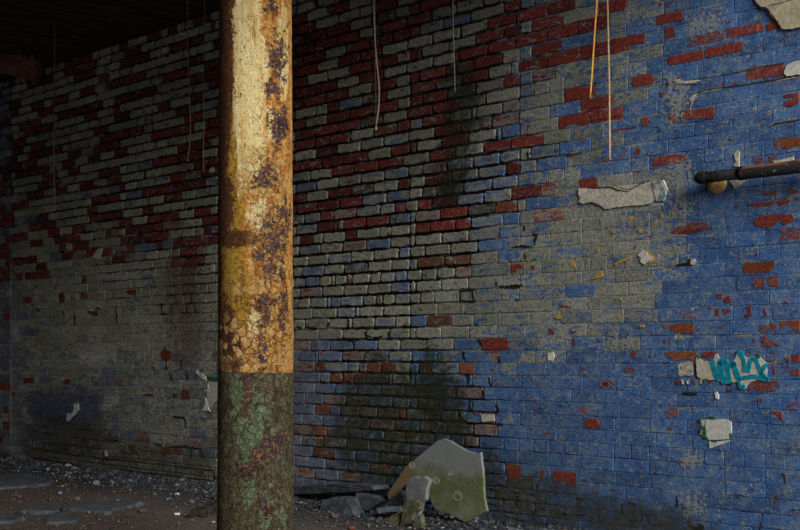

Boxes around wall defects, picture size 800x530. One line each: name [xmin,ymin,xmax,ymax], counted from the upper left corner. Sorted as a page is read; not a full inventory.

rust [262,0,291,153]
rust [249,158,280,190]
peeling [580,177,597,189]
rust [243,195,292,407]
damp [331,349,472,495]
peeling [700,420,731,448]